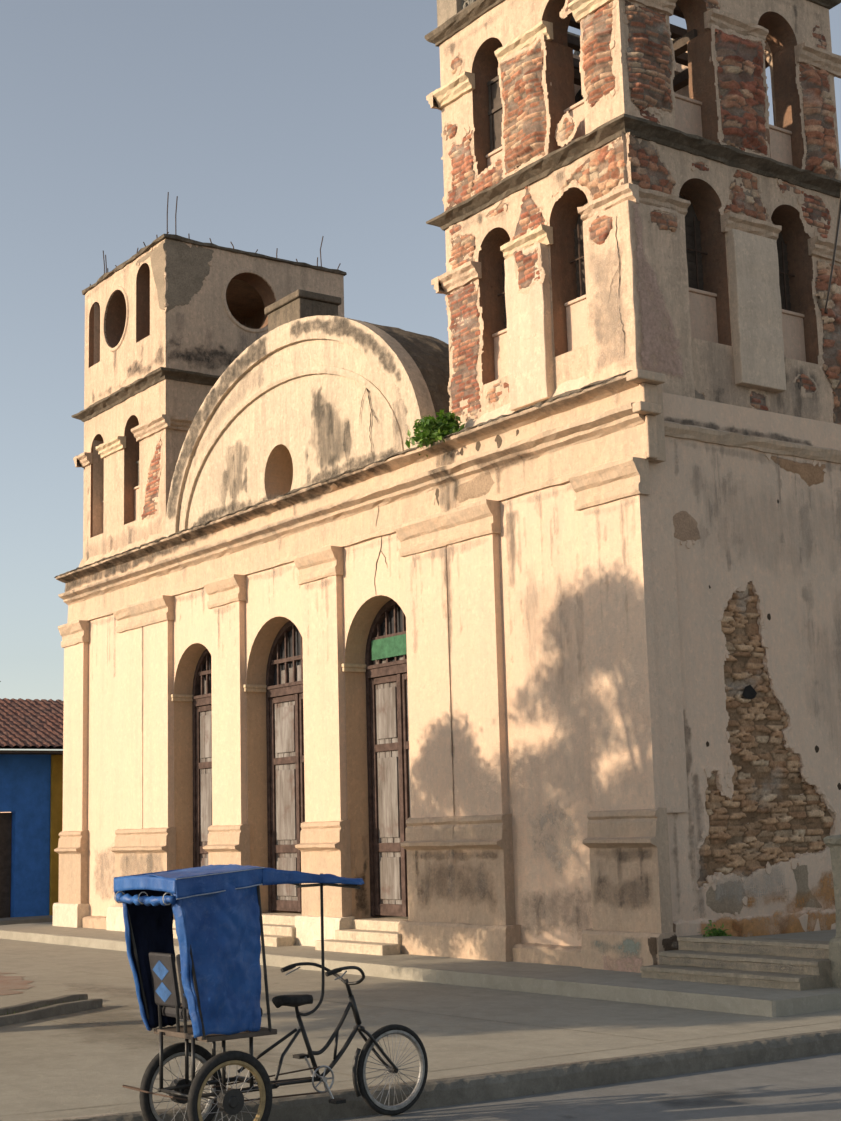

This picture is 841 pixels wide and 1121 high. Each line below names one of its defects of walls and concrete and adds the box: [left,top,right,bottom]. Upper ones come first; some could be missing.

spalling [441,32,578,212]
spalling [560,0,676,126]
spalling [709,24,770,158]
spalling [795,58,841,180]
water stain [57,391,394,591]
crack [359,388,378,454]
crack [374,507,387,591]
spalling [445,280,510,422]
spalling [484,132,680,295]
crack [608,216,625,353]
spalling [791,256,841,425]
spalling [693,570,840,916]